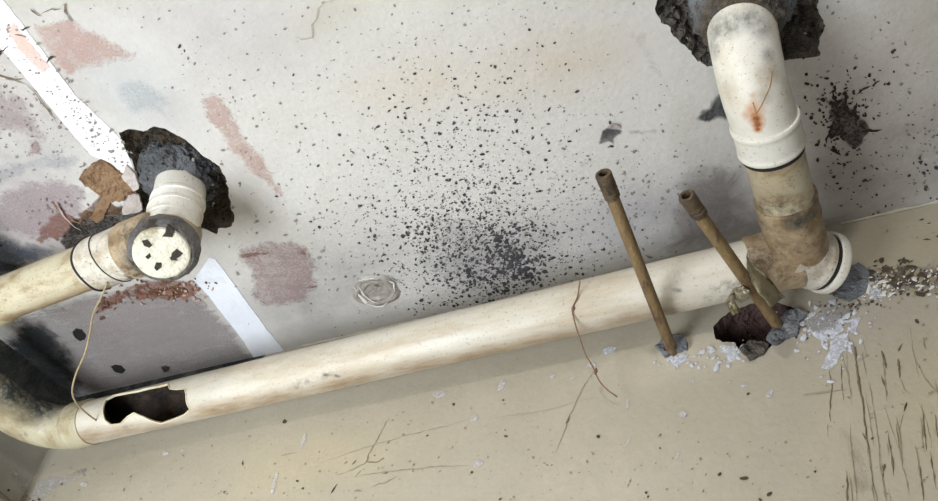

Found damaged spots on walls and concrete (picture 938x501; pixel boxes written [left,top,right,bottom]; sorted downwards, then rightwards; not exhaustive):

spalling [655,0,713,67]
spalling [779,0,825,61]
flaking render [55,126,198,230]
spalling [201,158,234,234]
damp [289,22,626,319]
damp [608,140,703,259]
damp [699,95,727,121]
mould [797,65,938,216]
damp [0,229,53,276]
rust [91,278,218,320]
spalling [653,303,772,372]
peeling [786,257,938,369]